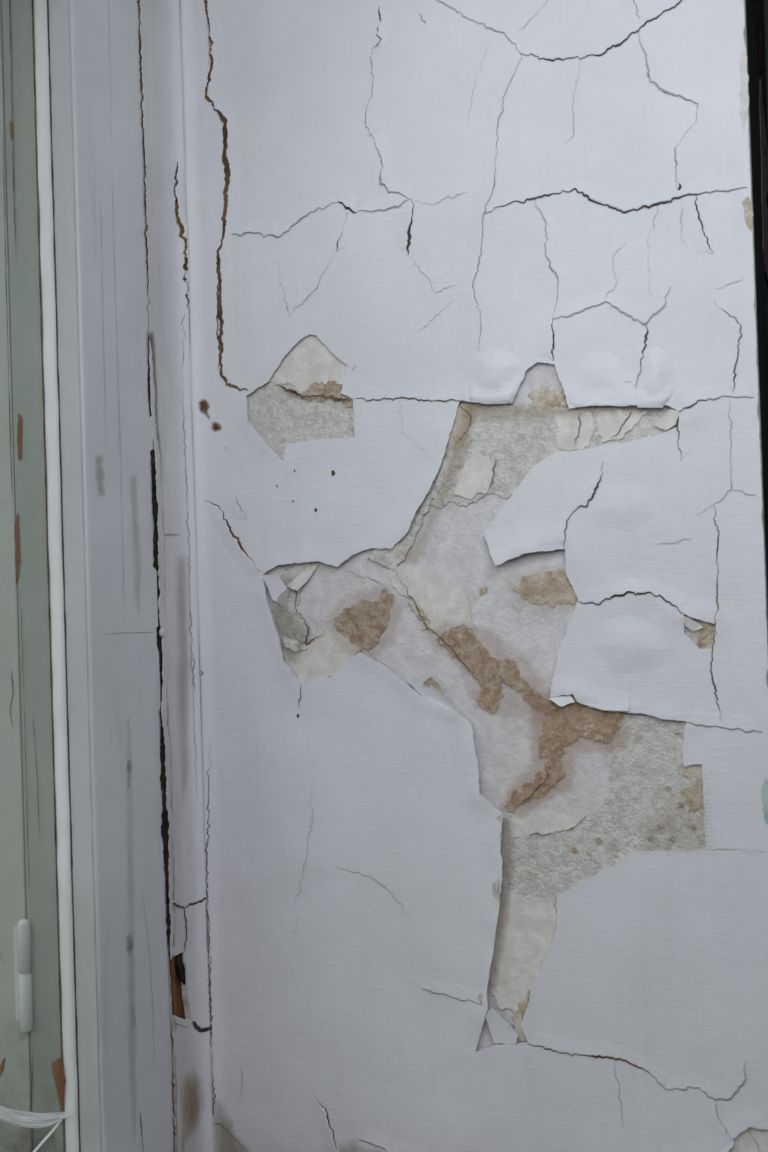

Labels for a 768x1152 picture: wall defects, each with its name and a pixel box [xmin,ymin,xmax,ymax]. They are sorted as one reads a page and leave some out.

crack [204,0,747,391]
peeling [739,0,768,282]
peeling [247,335,355,459]
crack [352,365,464,456]
crack [552,462,603,547]
crack [656,280,763,733]
crack [101,0,265,1152]
crack [578,577,686,614]
peeling [262,362,715,1051]
flaking render [169,953,192,1028]
crack [528,1032,747,1139]
peeling [719,1127,768,1152]